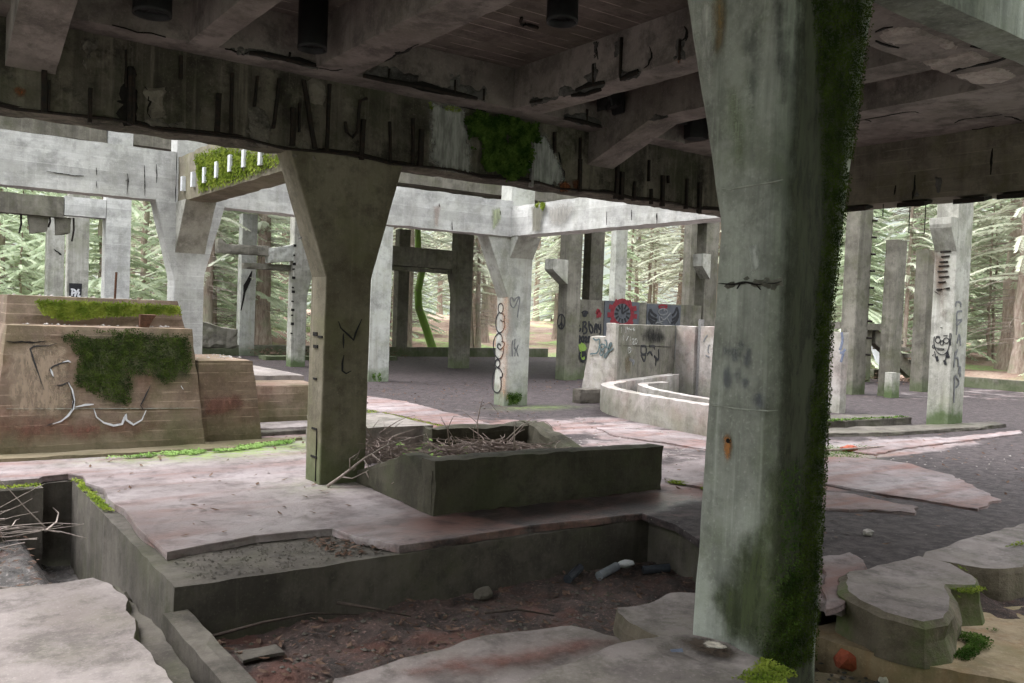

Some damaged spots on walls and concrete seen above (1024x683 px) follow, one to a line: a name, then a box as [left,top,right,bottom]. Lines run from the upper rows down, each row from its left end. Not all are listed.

spalling [230,46,327,105]
spalling [529,42,606,128]
spalling [614,37,641,81]
crack [875,26,899,48]
crack [950,45,1006,73]
spalling [0,65,720,211]
crack [861,112,919,122]
crack [718,281,782,290]